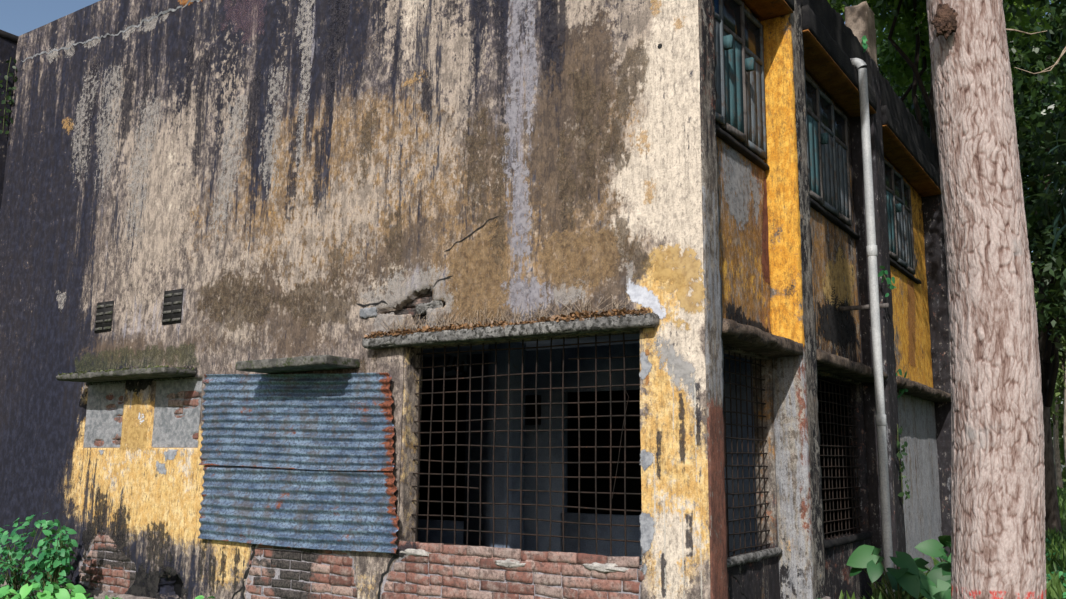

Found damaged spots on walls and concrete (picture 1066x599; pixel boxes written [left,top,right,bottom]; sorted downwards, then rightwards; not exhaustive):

water stain [183,36,211,173]
water stain [461,0,648,321]
peeling [724,144,762,231]
water stain [197,243,357,331]
flaking render [359,218,510,327]
water stain [610,208,666,319]
peeling [94,389,152,455]
flaking render [167,391,201,418]
flaking render [639,352,652,379]
flaking render [640,449,653,471]
water stain [82,489,172,599]
water stain [198,539,240,599]